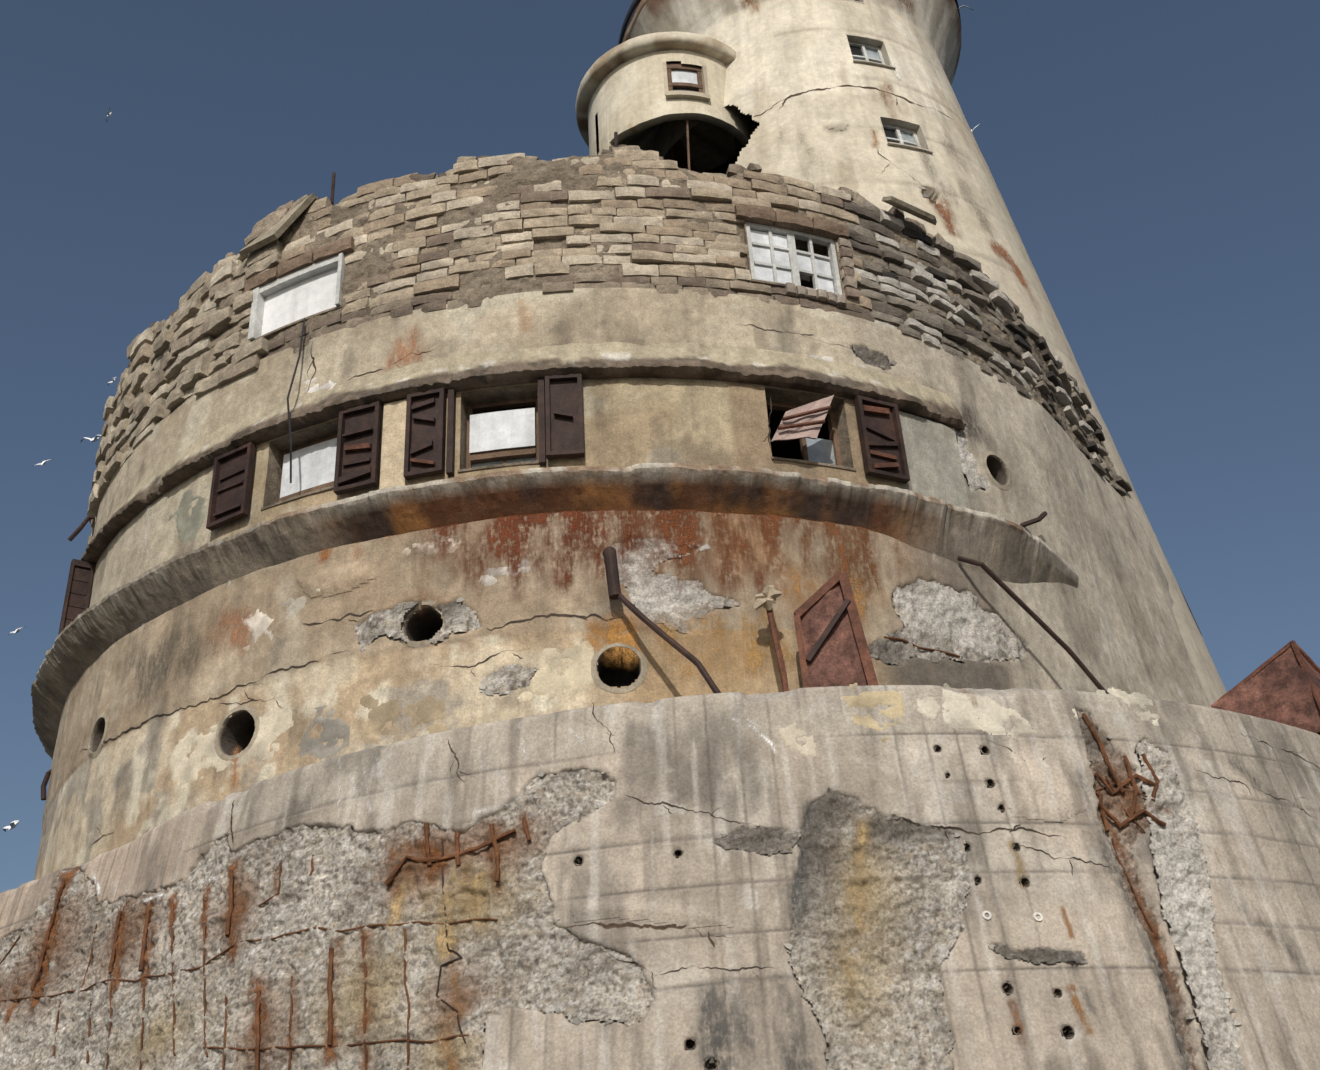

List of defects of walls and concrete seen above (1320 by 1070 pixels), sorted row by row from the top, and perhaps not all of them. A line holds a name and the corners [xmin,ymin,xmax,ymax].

crack [753,85,952,119]
corrosion [929,198,955,234]
corrosion [991,243,1027,288]
crack [80,610,375,753]
crack [439,613,626,676]
corrosion [472,509,748,588]
spalling [612,537,740,633]
corrosion [752,514,879,620]
spalling [868,578,1027,665]
spalling [0,769,653,1070]
crack [889,817,1113,875]
spalling [1071,708,1246,1070]